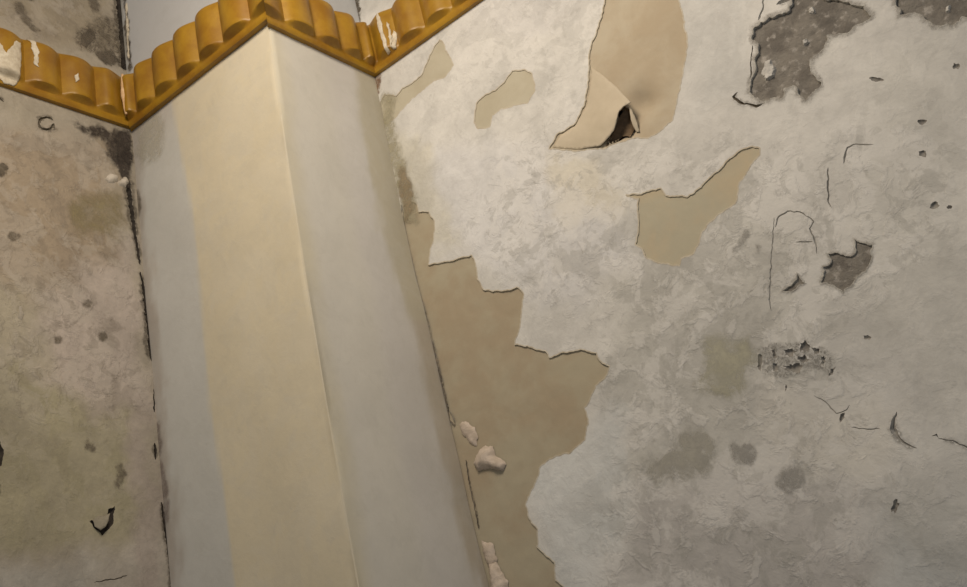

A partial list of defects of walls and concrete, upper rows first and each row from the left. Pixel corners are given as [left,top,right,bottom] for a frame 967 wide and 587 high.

spalling [0,39,39,86]
spalling [376,13,397,55]
peeling [380,39,454,121]
peeling [473,69,535,129]
peeling [548,0,688,152]
spalling [748,0,874,104]
spalling [893,0,967,27]
peeling [626,145,761,266]
spalling [820,238,874,294]
peeling [402,200,610,587]
spalling [757,341,835,391]
crack [815,396,967,448]